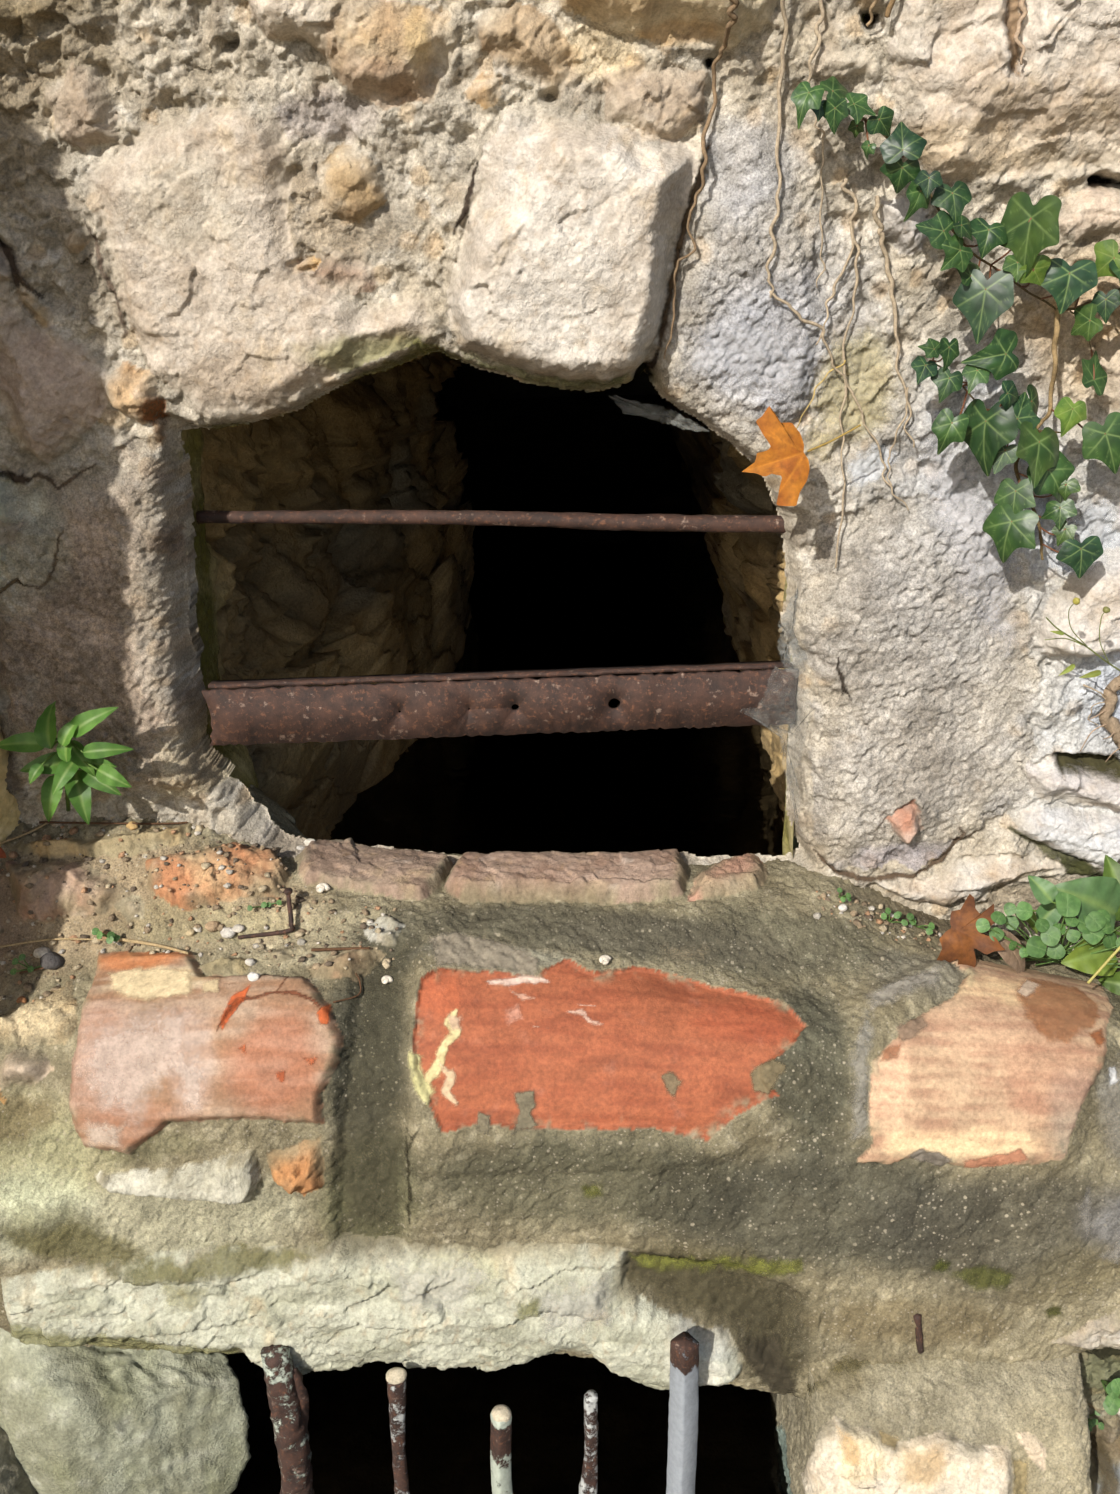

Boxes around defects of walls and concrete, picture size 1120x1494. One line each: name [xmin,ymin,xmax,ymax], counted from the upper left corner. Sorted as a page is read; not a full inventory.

crack [453,162,478,234]
spalling [203,972,260,1029]
spalling [317,1005,331,1024]
peeling [509,994,528,1019]
peeling [882,1045,900,1060]
peeling [750,1059,785,1094]
spalling [909,1149,1027,1168]